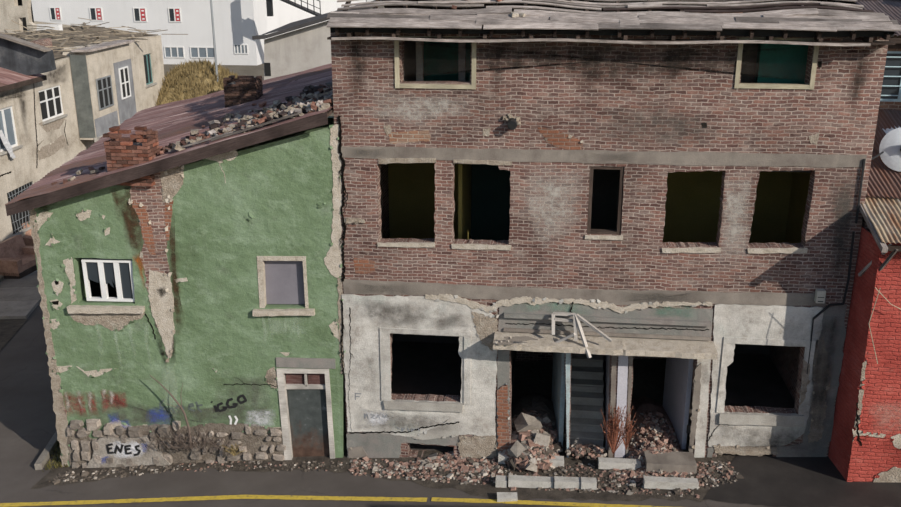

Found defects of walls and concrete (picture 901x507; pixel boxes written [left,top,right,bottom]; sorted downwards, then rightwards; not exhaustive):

spalling [28,165,184,467]
peeling [324,124,375,375]
crack [338,115,459,434]
spalling [425,294,713,351]
peeling [852,360,901,451]
peeling [873,466,901,482]